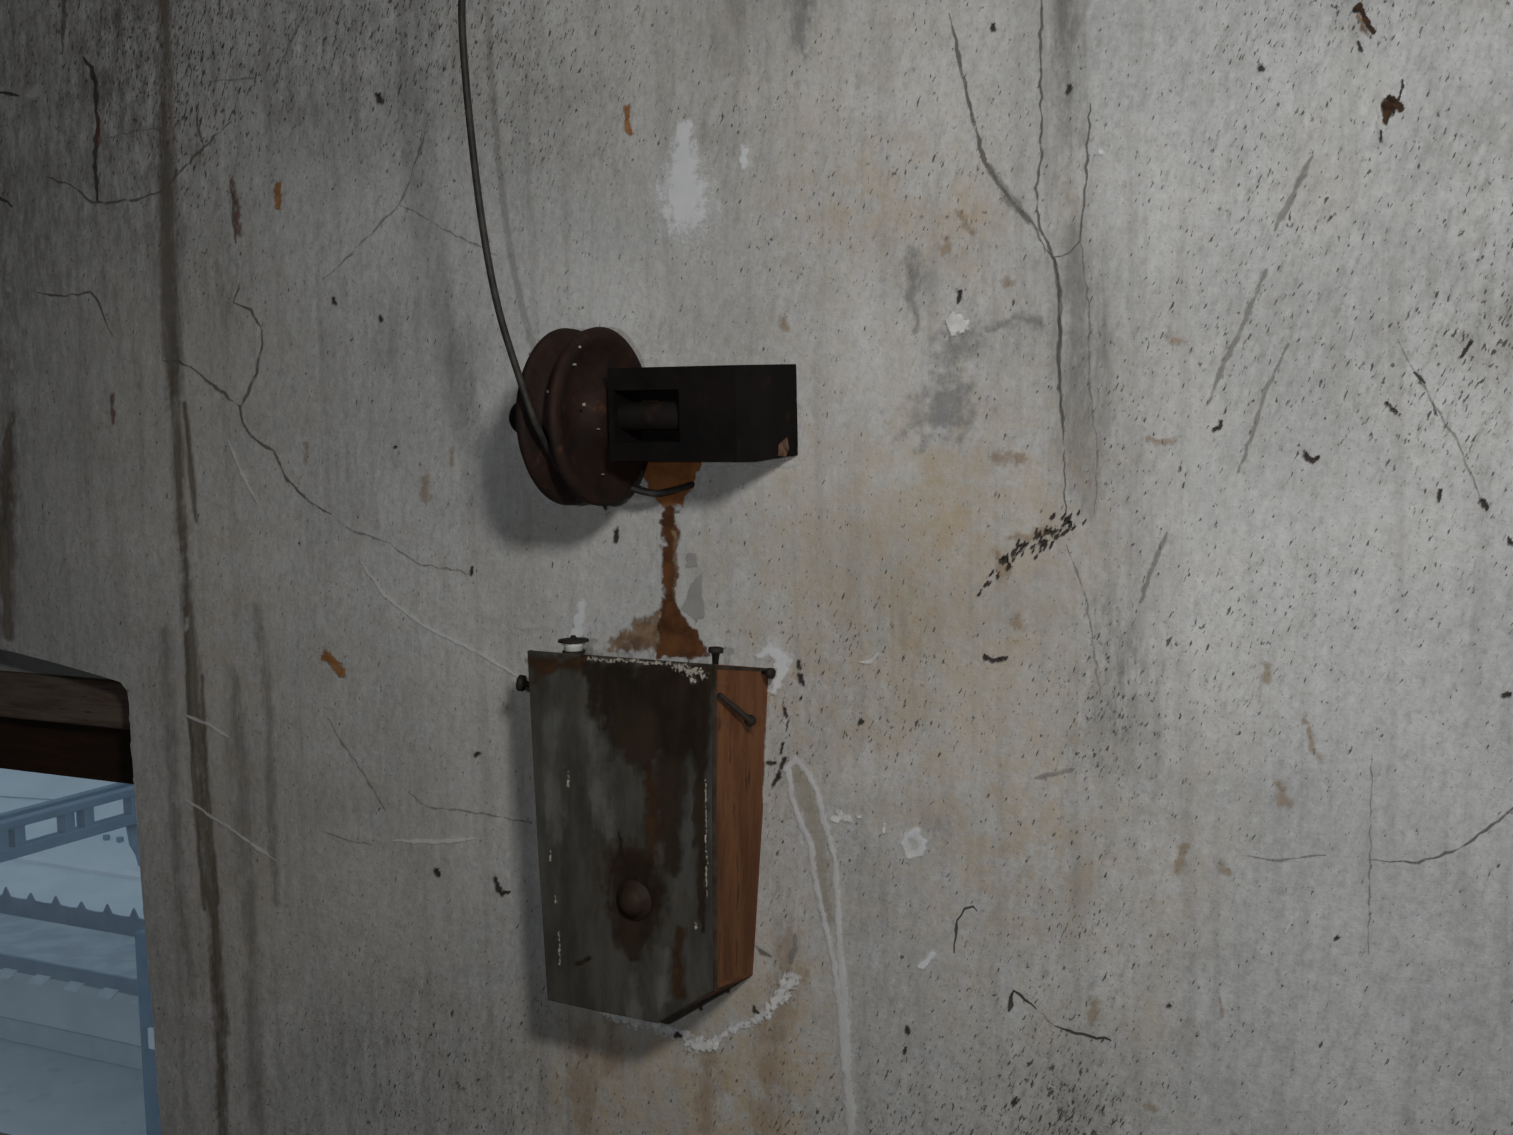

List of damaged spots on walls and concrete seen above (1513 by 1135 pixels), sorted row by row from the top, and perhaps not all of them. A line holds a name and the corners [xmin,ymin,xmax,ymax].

corrosion [624,105,633,135]
crack [229,180,237,244]
crack [949,0,1091,513]
crack [38,291,113,336]
crack [162,284,331,514]
damp [158,0,228,1135]
corrosion [608,462,710,659]
spalling [977,509,1087,596]
crack [1375,808,1513,864]
crack [1008,989,1111,1041]